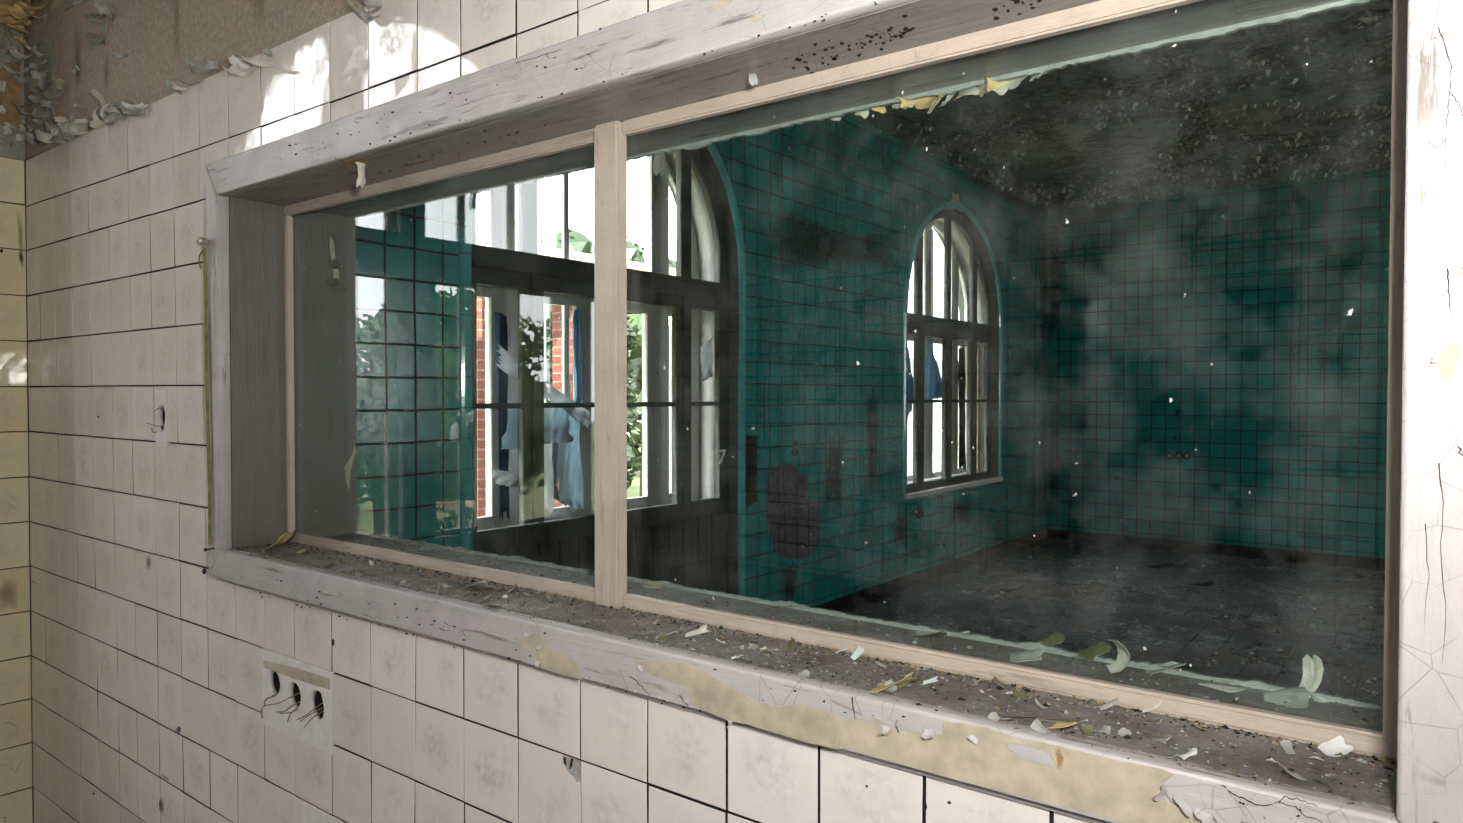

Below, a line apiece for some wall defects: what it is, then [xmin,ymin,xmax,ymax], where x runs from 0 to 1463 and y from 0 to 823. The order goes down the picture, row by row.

peeling [347,0,383,22]
peeling [164,48,276,95]
peeling [830,0,1393,211]
crack [1429,27,1463,170]
crack [1446,267,1463,320]
peeling [745,435,820,560]
peeling [655,625,710,639]
peeling [1010,632,1186,674]
peeling [1263,654,1328,708]
peeling [631,658,1265,823]
spalling [563,755,581,782]
crack [1221,785,1322,822]